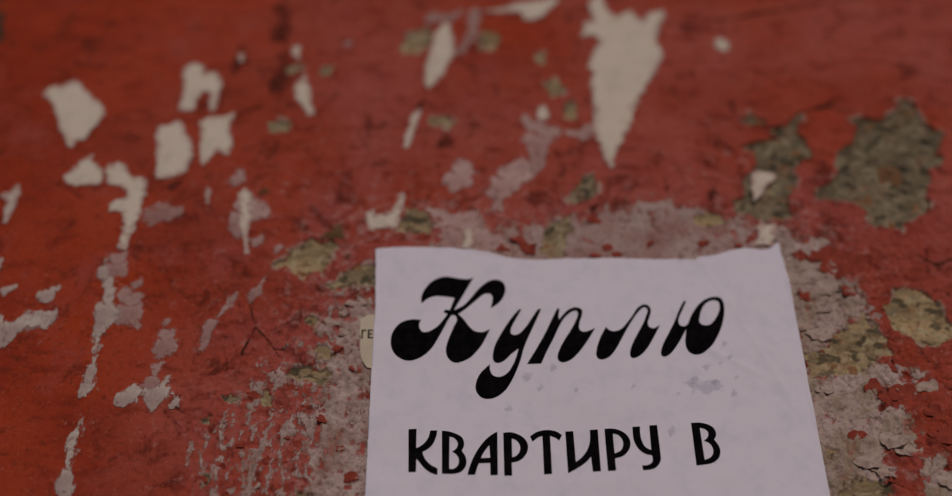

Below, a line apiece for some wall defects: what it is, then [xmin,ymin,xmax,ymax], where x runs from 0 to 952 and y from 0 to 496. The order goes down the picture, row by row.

spalling [399,27,433,55]
spalling [544,79,578,122]
spalling [273,239,337,279]
peeling [473,101,952,496]
peeling [186,259,376,496]